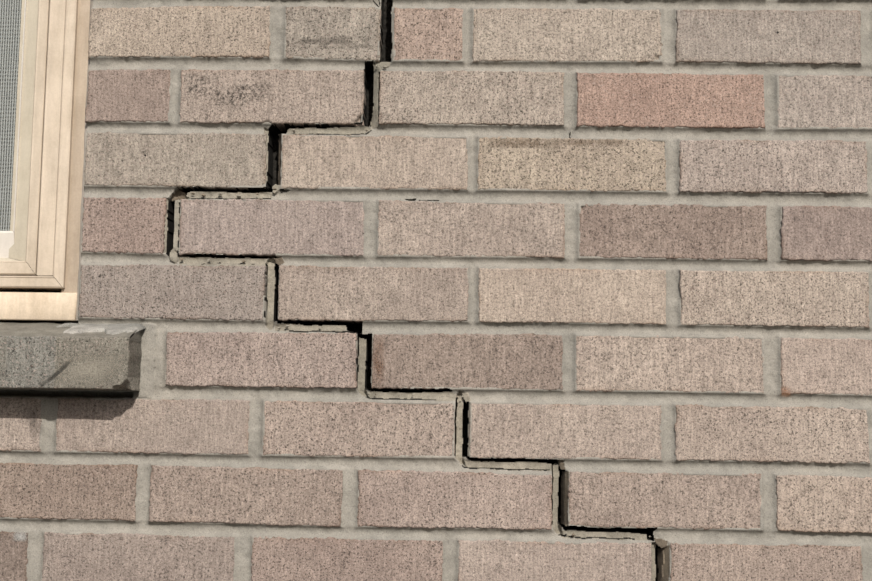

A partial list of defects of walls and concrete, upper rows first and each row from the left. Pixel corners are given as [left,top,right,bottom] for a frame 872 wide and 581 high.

crack [163,0,670,581]